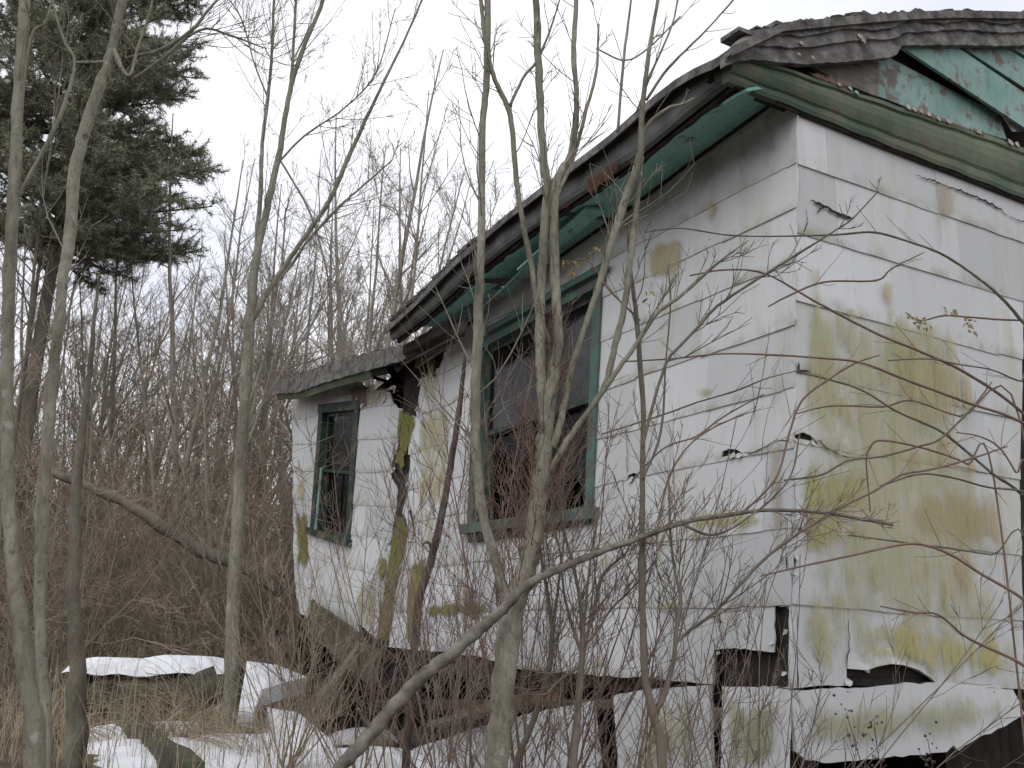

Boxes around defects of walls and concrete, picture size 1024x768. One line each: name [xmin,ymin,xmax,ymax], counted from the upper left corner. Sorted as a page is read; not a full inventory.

crack [811,200,852,219]
crack [915,174,1024,222]
water stain [880,284,972,428]